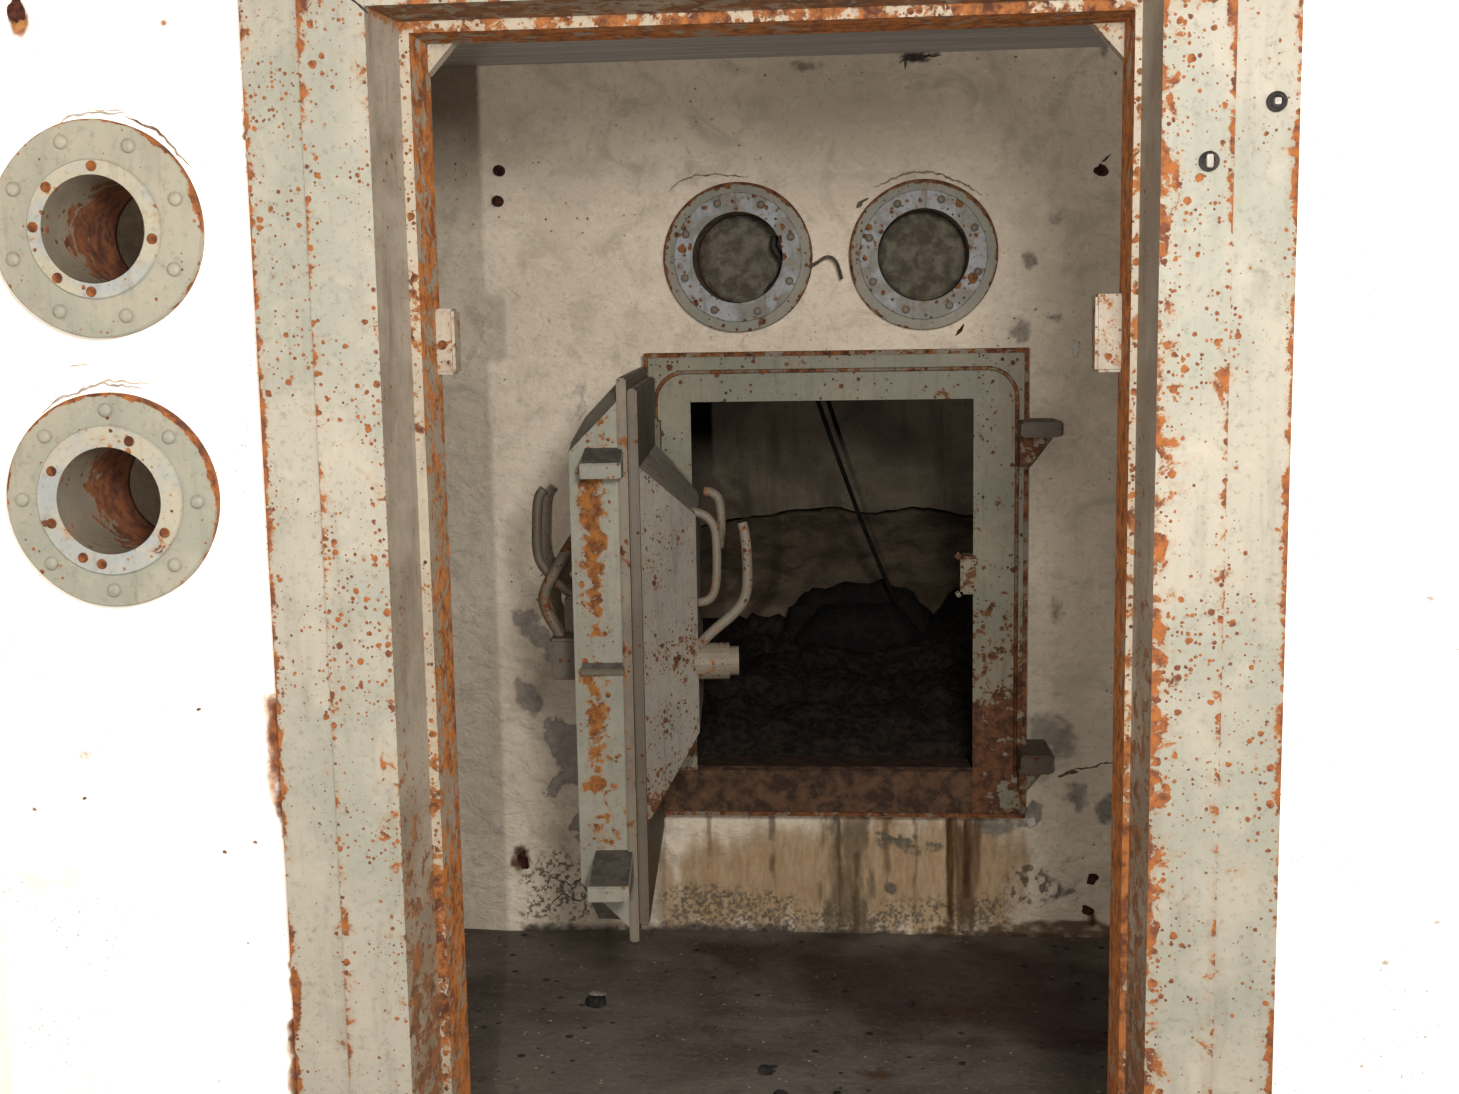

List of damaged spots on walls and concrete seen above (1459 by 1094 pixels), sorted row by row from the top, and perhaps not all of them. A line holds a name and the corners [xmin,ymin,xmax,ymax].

rust [266,698,284,837]
crack [1058,762,1112,778]
damp [664,817,1023,934]
rust [288,1019,298,1094]